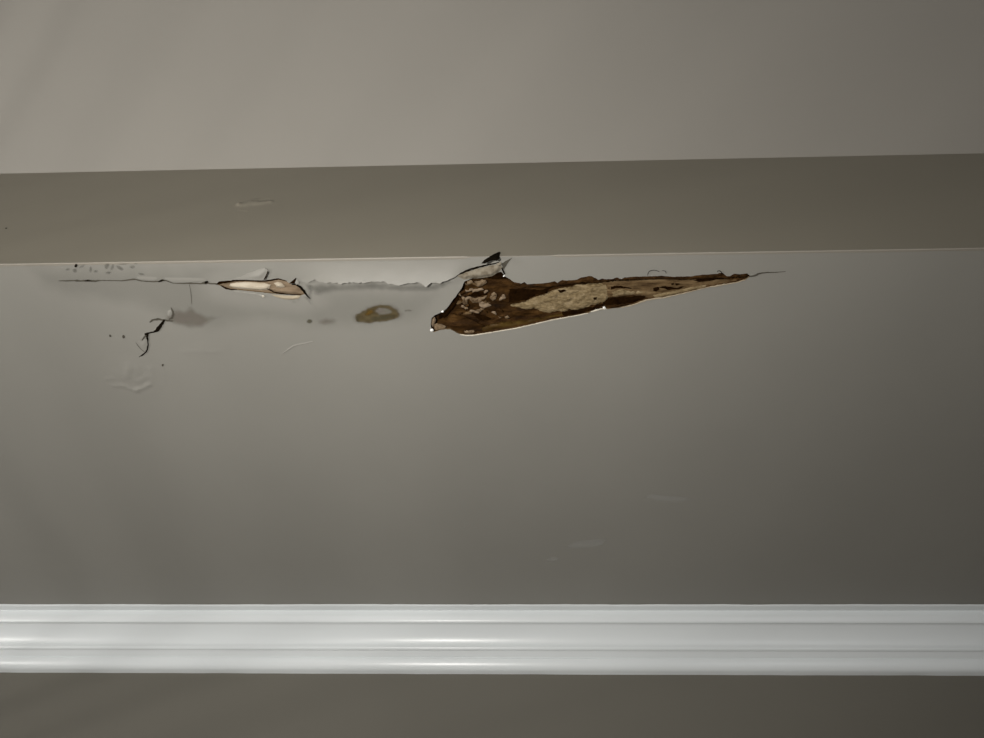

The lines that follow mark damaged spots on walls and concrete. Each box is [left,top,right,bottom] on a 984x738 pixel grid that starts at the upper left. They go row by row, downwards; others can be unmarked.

peeling [217,252,749,300]
crack [60,276,217,357]
leakage [356,305,399,323]